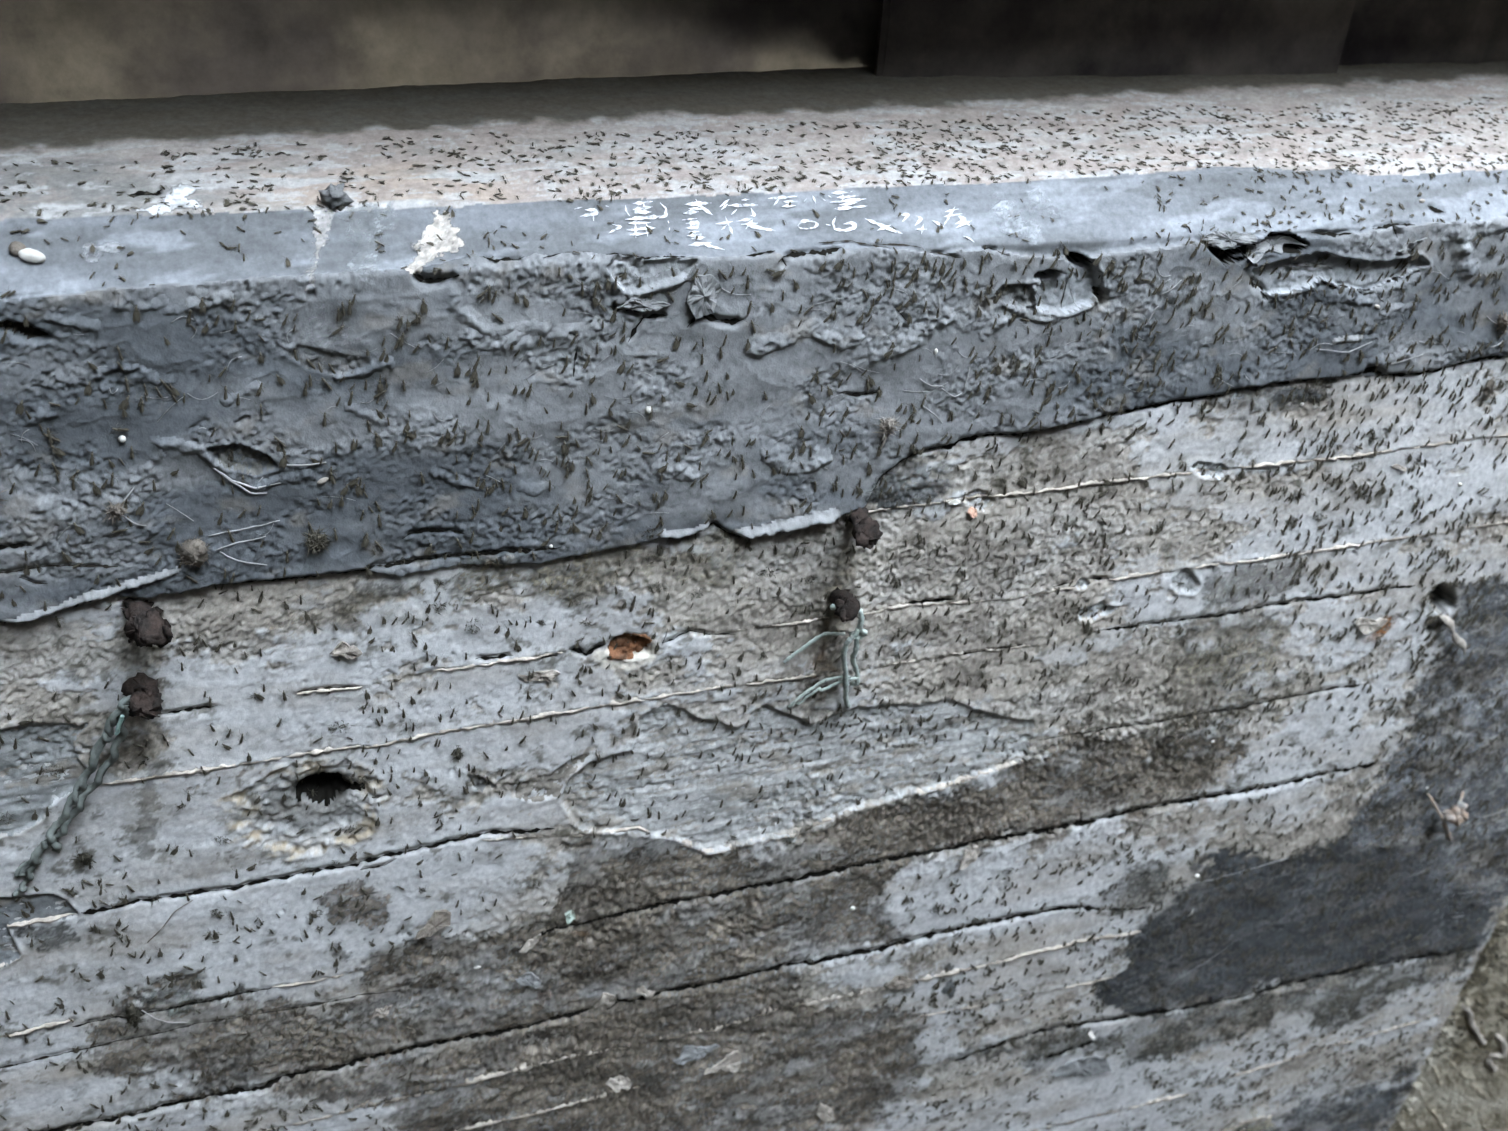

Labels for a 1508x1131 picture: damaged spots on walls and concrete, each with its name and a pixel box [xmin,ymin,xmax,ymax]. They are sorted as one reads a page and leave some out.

peeling [1203,230,1430,295]
peeling [606,256,721,319]
peeling [995,256,1103,315]
spalling [0,320,48,339]
spalling [288,344,370,375]
spalling [214,443,275,475]
spalling [1190,462,1229,480]
spalling [948,490,995,518]
spalling [844,507,883,550]
water stain [85,562,1508,1131]